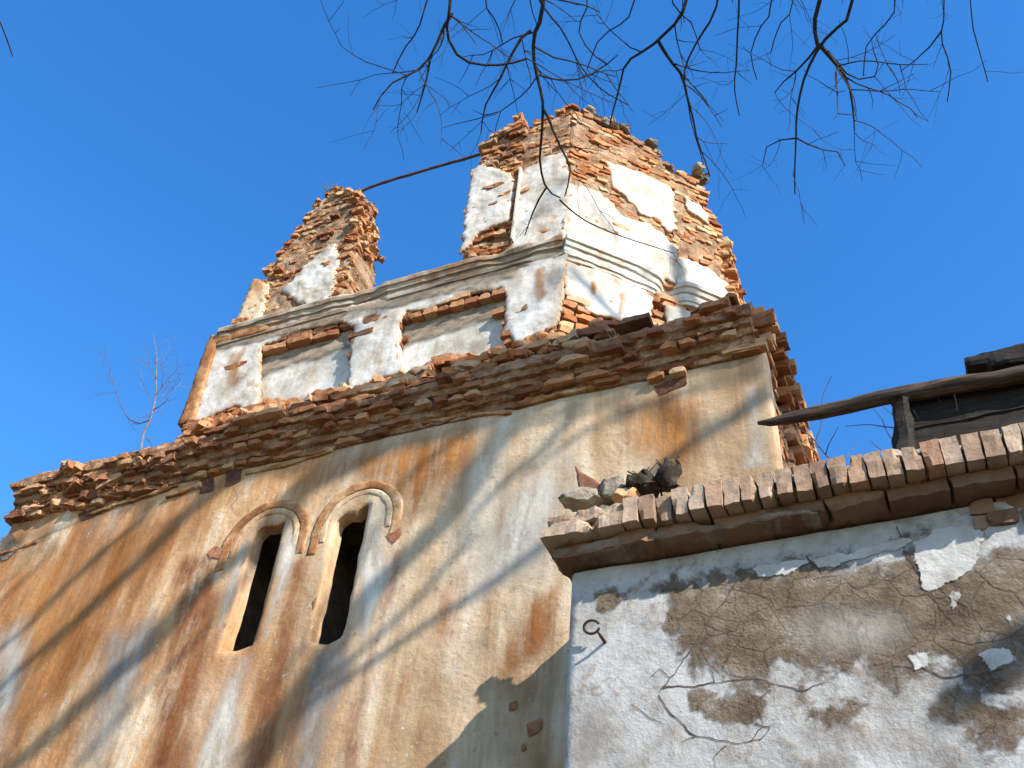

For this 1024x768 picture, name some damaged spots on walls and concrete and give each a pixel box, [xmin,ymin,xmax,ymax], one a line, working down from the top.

corrosion [635,398,695,461]
corrosion [0,524,178,718]
corrosion [153,558,216,768]
corrosion [252,629,289,768]
corrosion [509,594,551,667]
crack [631,581,826,765]
spalling [652,493,1024,752]
crack [894,527,1024,693]